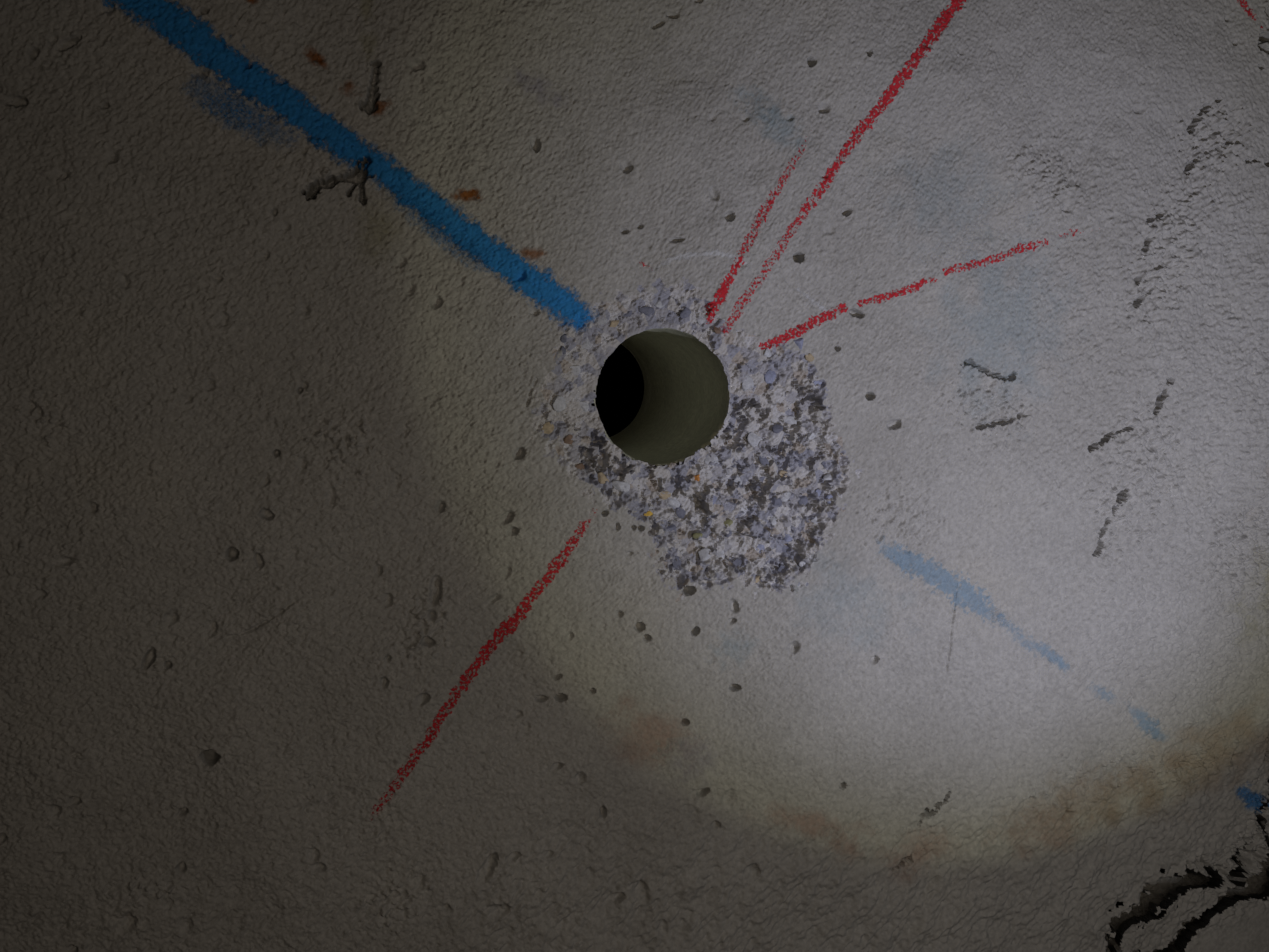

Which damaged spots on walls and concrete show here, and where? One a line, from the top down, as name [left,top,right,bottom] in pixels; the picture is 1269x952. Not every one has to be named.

crack [301,156,375,206]
spalling [529,277,863,602]
crack [944,582,958,674]
crack [1105,779,1269,952]